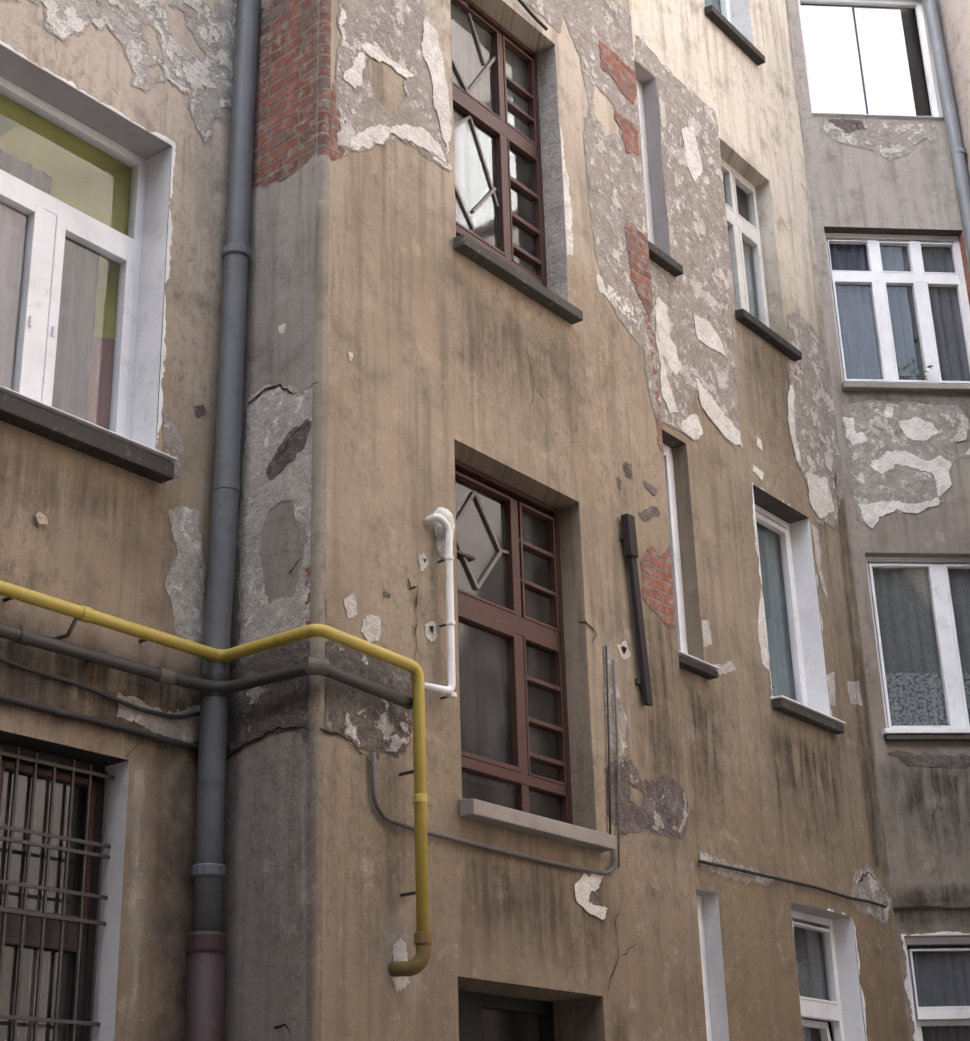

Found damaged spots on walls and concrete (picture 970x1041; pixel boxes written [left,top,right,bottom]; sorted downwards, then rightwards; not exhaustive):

flaking render [1,0,238,145]
flaking render [252,0,318,189]
flaking render [331,0,453,172]
flaking render [820,118,940,161]
flaking render [522,0,743,453]
flaking render [785,312,970,600]
flaking render [164,506,207,644]
flaking render [226,384,313,759]
flaking render [641,545,677,628]
flaking render [325,593,413,759]
flaking render [603,640,689,839]
flaking render [851,863,892,924]